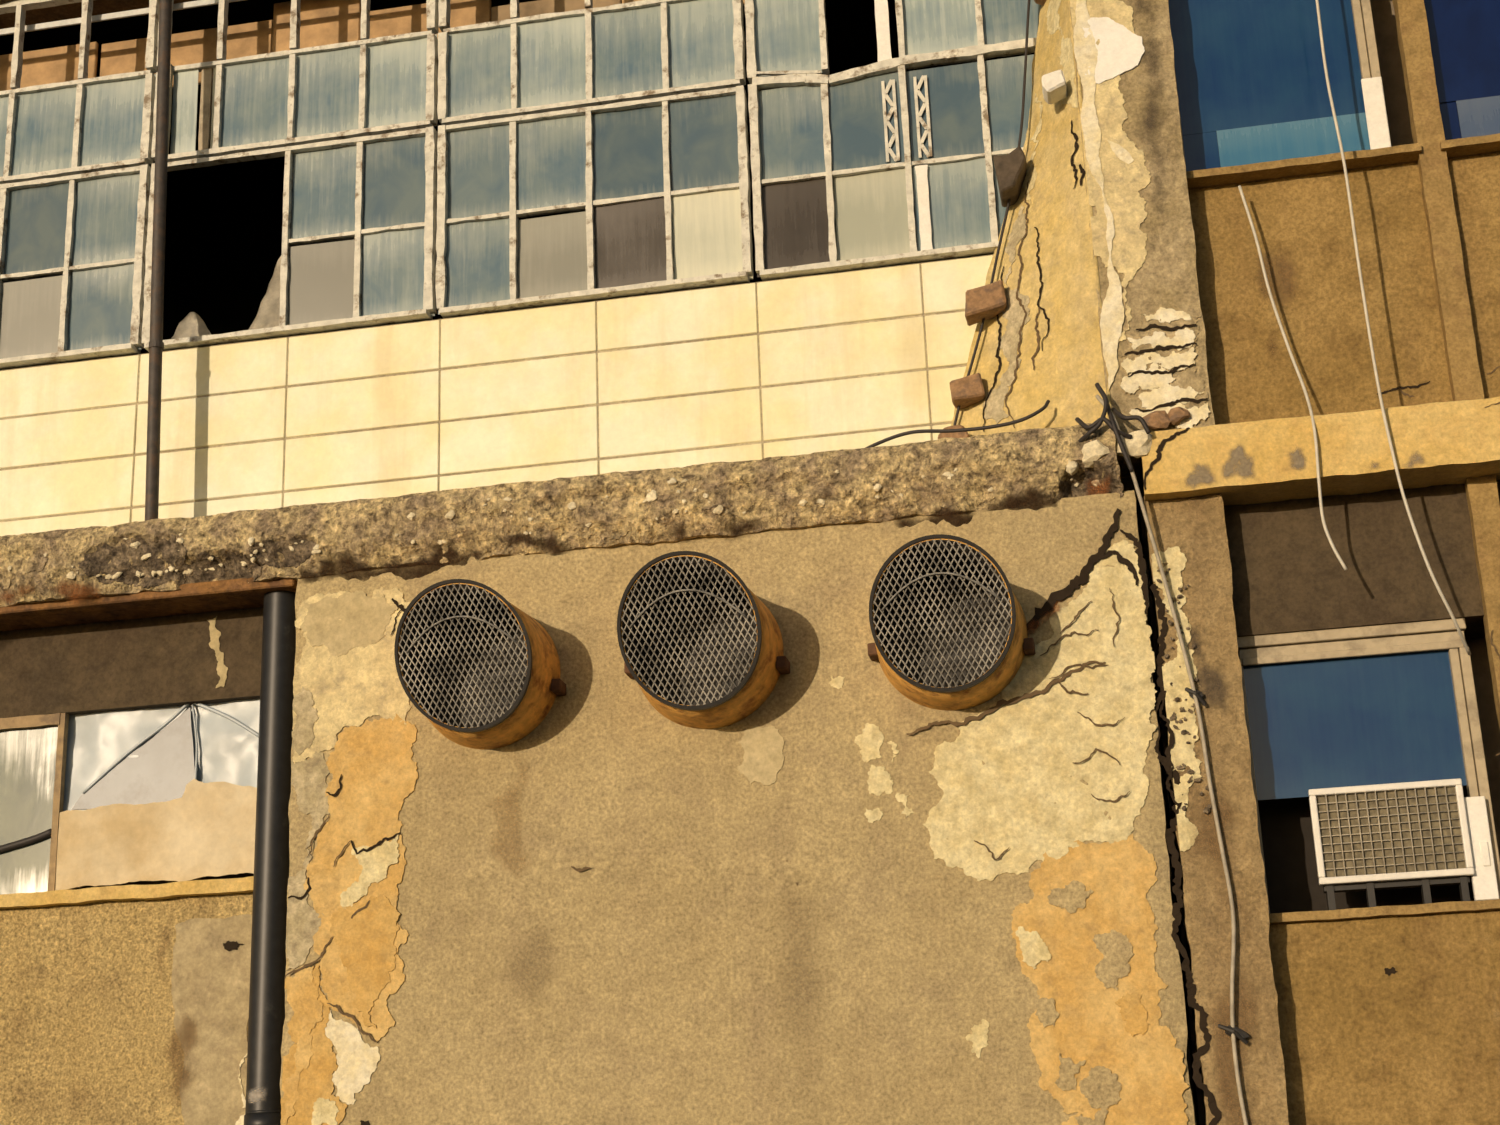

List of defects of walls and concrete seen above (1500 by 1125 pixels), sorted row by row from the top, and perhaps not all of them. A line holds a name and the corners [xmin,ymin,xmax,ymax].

flaking render [1046,0,1211,501]
crack [982,180,1049,431]
spalling [0,551,48,591]
spalling [66,528,321,589]
spalling [390,470,855,563]
spalling [872,459,1021,513]
flaking render [207,616,228,688]
crack [906,661,1106,735]
crack [997,427,1222,1125]
flaking render [281,587,419,1125]
flaking render [854,539,1212,1125]
flaking render [235,1054,247,1125]